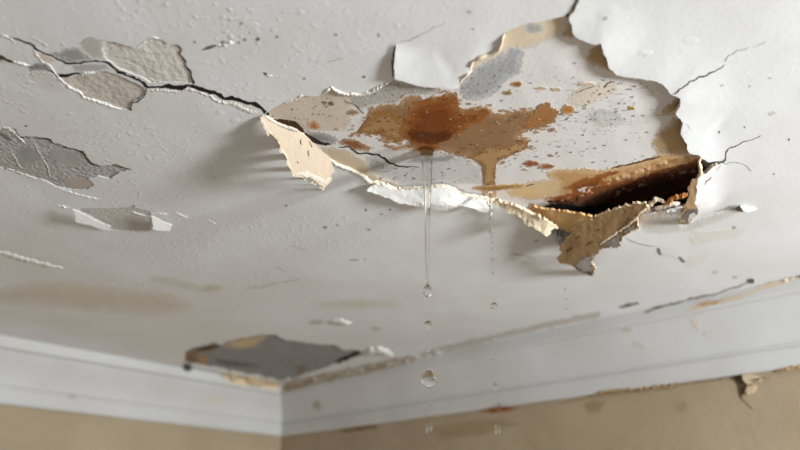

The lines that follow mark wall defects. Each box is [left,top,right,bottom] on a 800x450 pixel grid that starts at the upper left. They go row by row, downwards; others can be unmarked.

crack [0,37,271,117]
spalling [103,38,192,82]
crack [673,42,765,95]
water stain [268,16,581,206]
spalling [0,125,126,189]
peeling [260,101,409,190]
spalling [367,29,698,276]
crack [705,136,760,185]
spalling [73,205,172,232]
spalling [183,335,362,391]